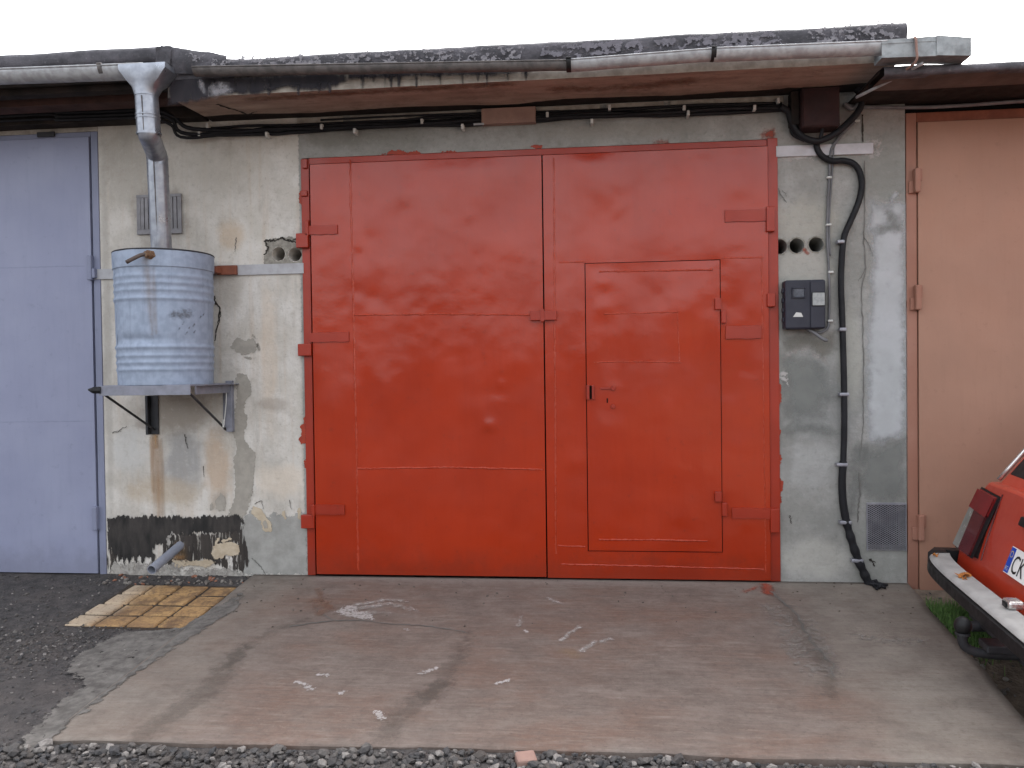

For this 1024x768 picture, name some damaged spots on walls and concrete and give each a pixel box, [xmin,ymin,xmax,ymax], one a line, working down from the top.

leakage [168,72,527,104]
spalling [263,236,302,264]
crack [857,114,873,522]
peeling [231,334,260,360]
peeling [109,373,308,576]